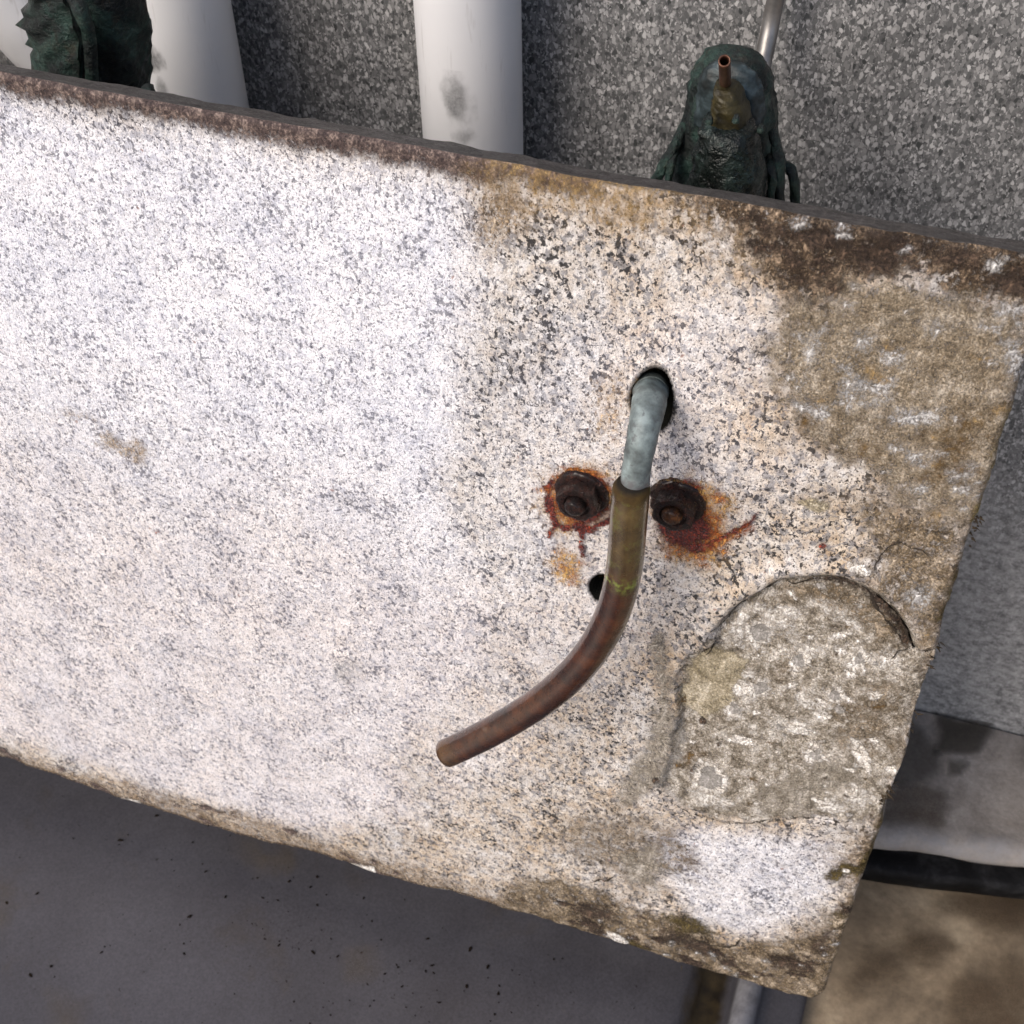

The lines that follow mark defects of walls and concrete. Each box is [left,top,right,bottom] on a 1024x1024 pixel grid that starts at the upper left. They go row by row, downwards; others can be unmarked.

corrosion [536,465,613,585]
corrosion [652,479,757,566]
spalling [652,557,931,825]